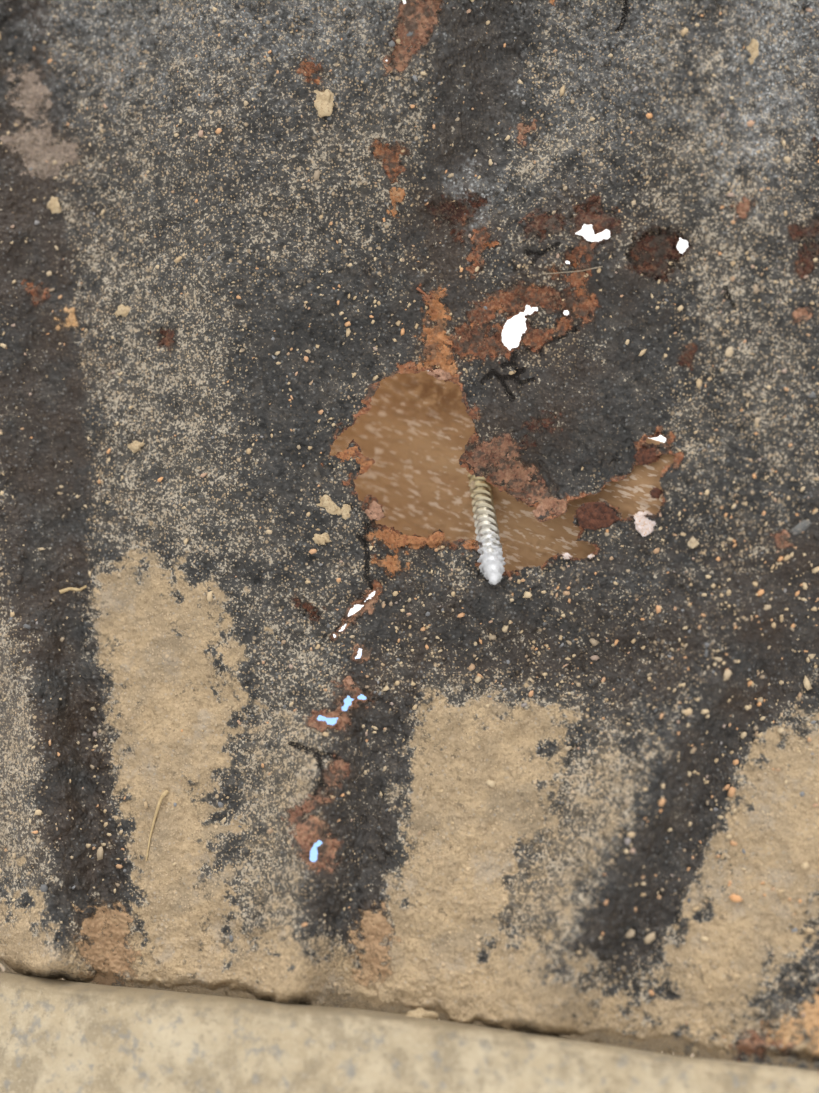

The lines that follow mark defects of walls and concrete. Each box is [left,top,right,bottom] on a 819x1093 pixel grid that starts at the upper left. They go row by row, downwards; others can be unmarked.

spalling [624,225,685,282]
peeling [337,439,372,474]
peeling [650,487,663,499]
peeling [364,500,445,550]
peeling [634,511,656,537]
damp [74,902,142,988]
damp [349,902,401,987]